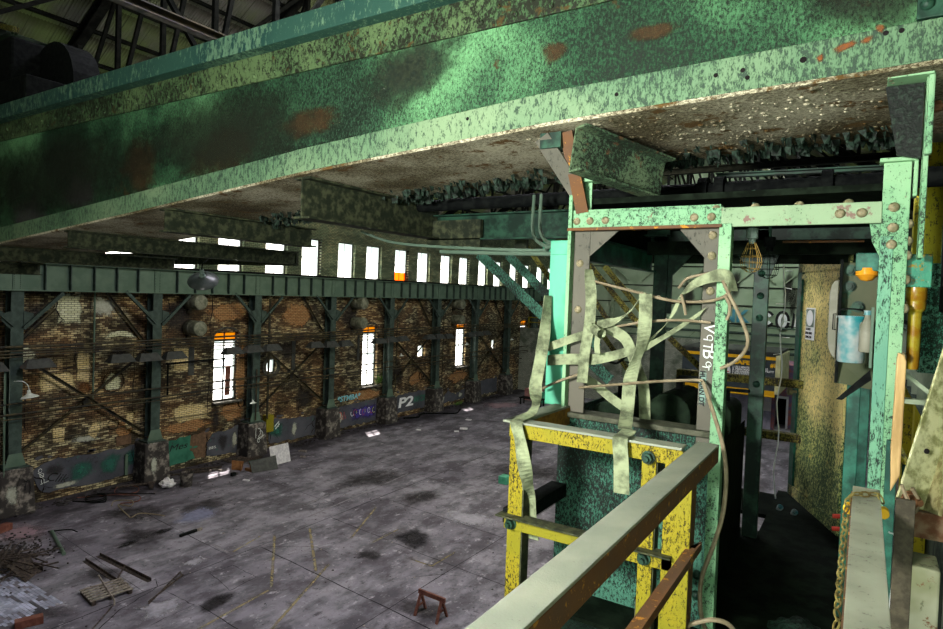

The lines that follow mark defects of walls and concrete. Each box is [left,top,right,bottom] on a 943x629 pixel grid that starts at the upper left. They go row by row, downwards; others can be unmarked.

corrosion [632,23,671,40]
corrosion [543,44,565,62]